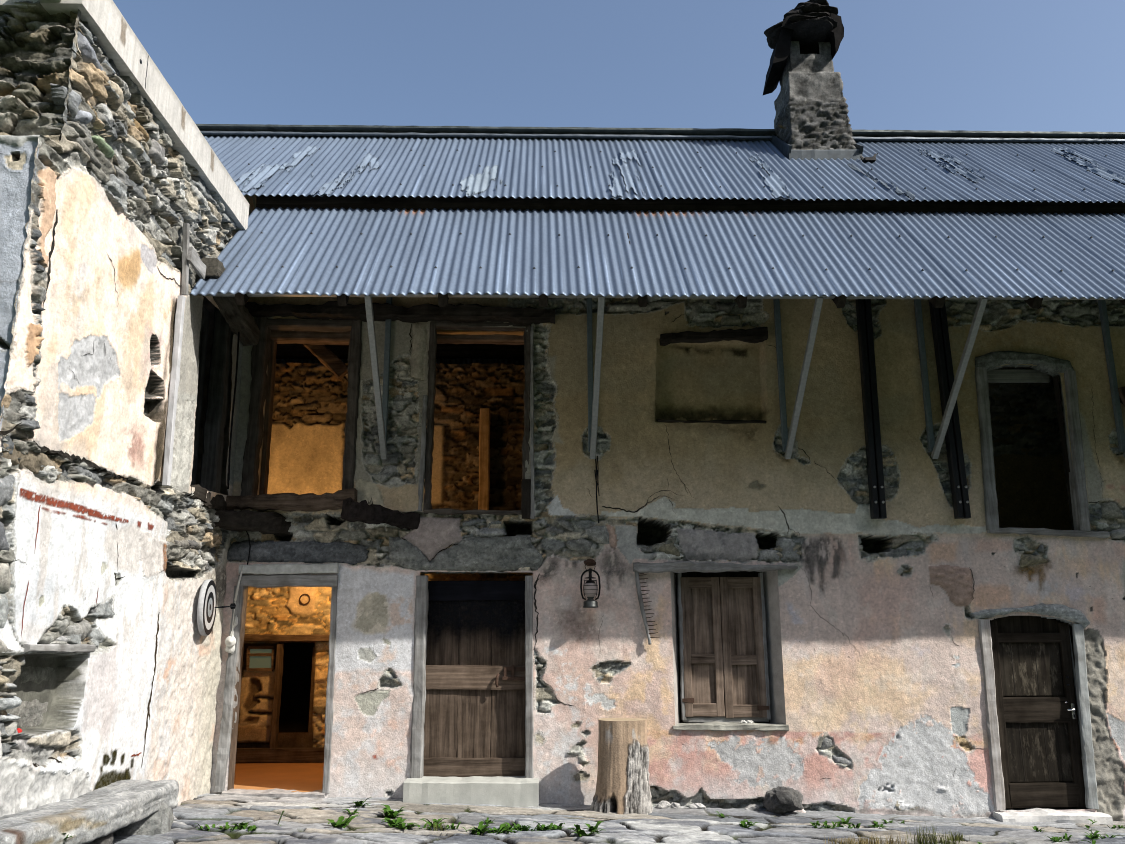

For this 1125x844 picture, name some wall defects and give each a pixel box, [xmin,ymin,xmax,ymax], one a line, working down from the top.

spalling [89,174,136,226]
flaking render [0,143,75,420]
crack [43,210,58,308]
flaking render [32,330,122,452]
flaking render [402,516,463,560]
spalling [504,520,534,536]
crack [588,425,694,514]
flaking render [545,422,987,587]
water stain [805,547,839,591]
crack [141,612,160,768]
flaking render [534,646,561,715]
flaking render [1084,625,1125,822]